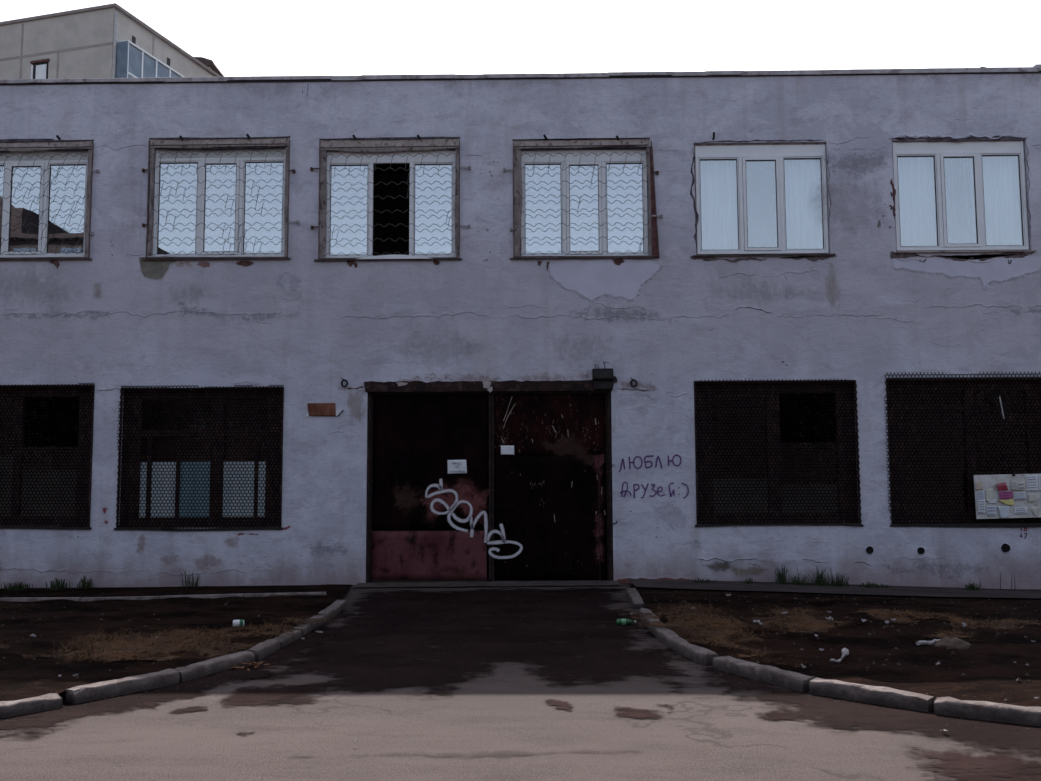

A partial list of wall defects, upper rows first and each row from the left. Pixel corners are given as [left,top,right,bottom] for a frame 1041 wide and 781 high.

flaking render [690,148,699,246]
flaking render [126,255,210,281]
flaking render [546,259,664,303]
flaking render [891,256,1041,291]